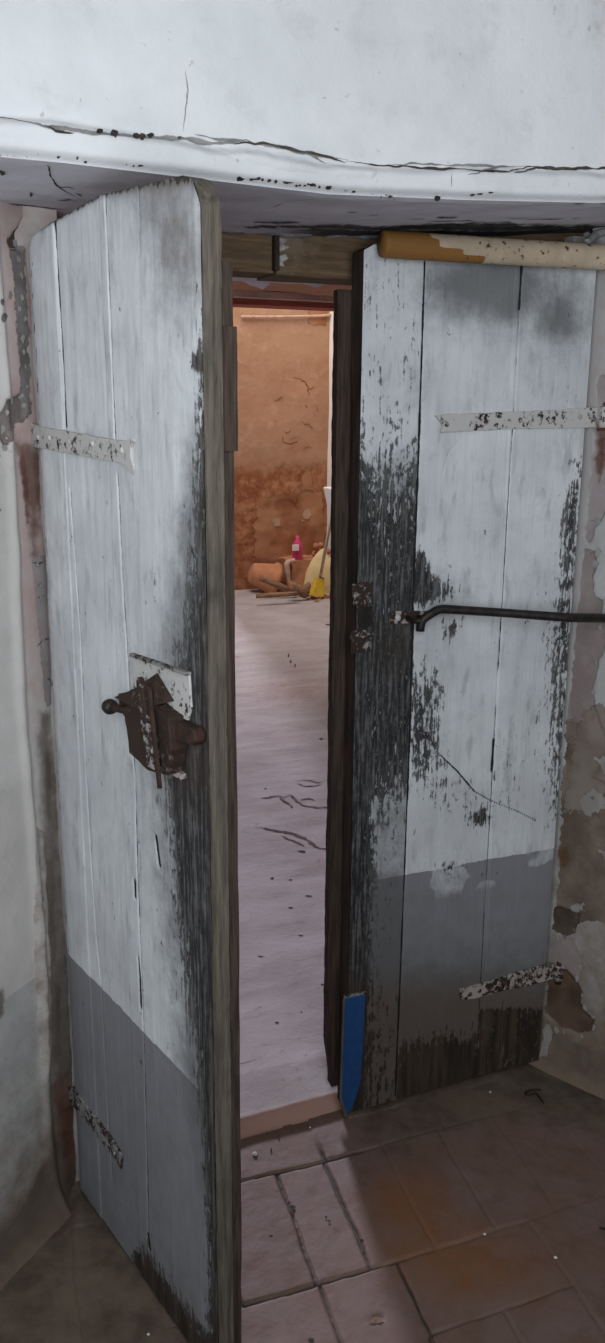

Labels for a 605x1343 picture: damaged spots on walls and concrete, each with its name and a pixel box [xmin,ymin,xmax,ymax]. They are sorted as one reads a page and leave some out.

crack [0,69,605,186]
crack [10,165,82,210]
spalling [552,375,605,939]
spalling [539,969,596,1057]